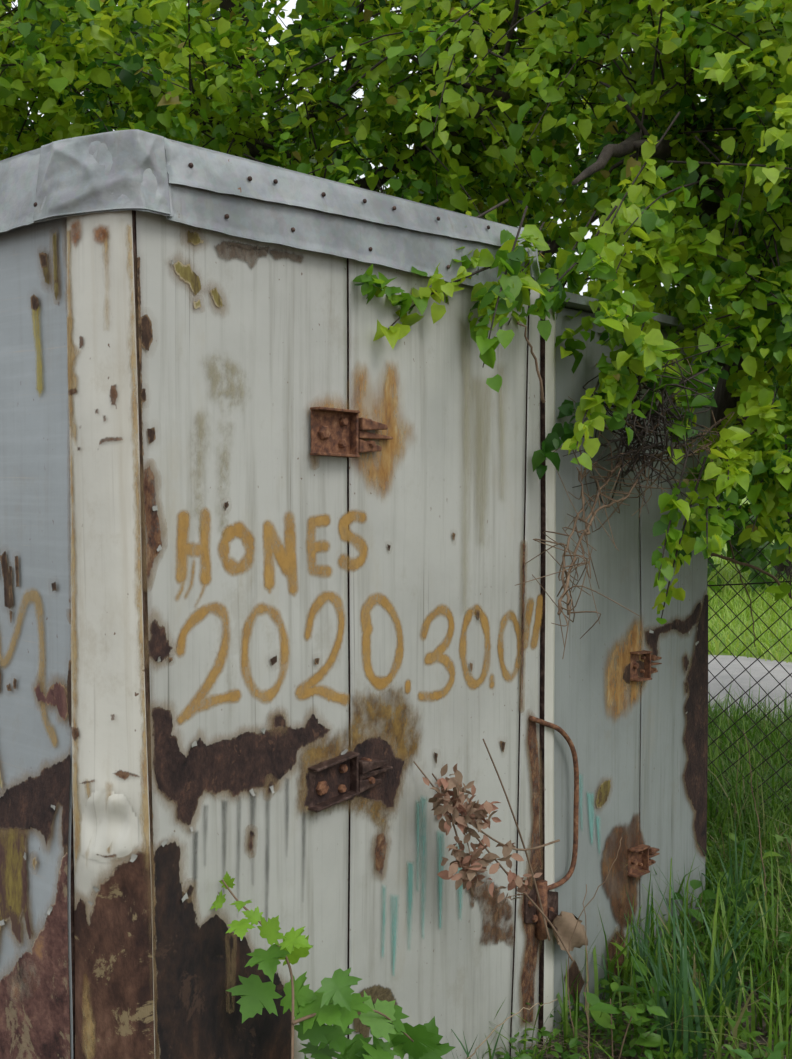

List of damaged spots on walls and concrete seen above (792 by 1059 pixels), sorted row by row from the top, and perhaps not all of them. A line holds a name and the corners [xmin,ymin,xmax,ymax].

rust [355,366,406,493]
rust [0,221,304,1059]
rust [606,622,644,717]
peeling [152,706,330,832]
rust [299,689,419,875]
rust [602,815,645,986]
rust [565,960,585,1004]